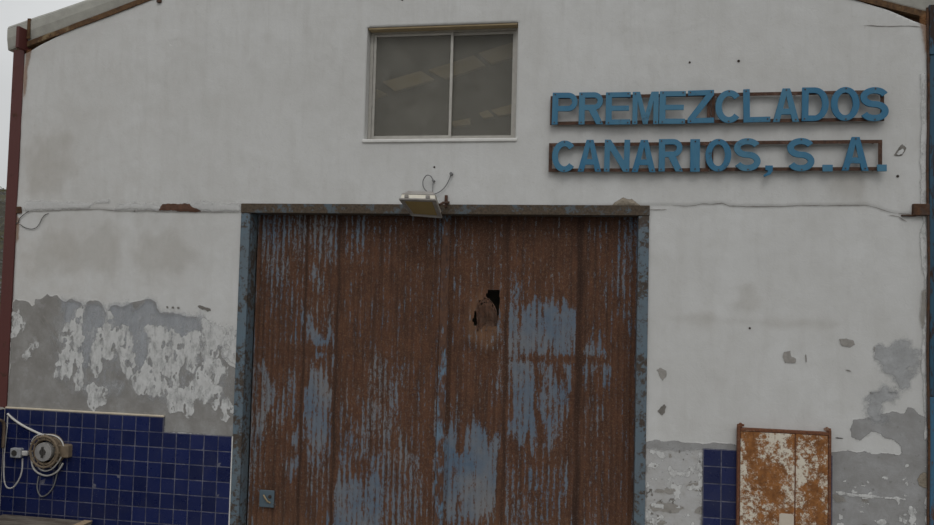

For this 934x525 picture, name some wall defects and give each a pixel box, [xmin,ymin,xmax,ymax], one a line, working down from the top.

peeling [7,292,237,436]
peeling [783,351,796,363]
peeling [831,216,928,525]
peeling [645,440,736,525]